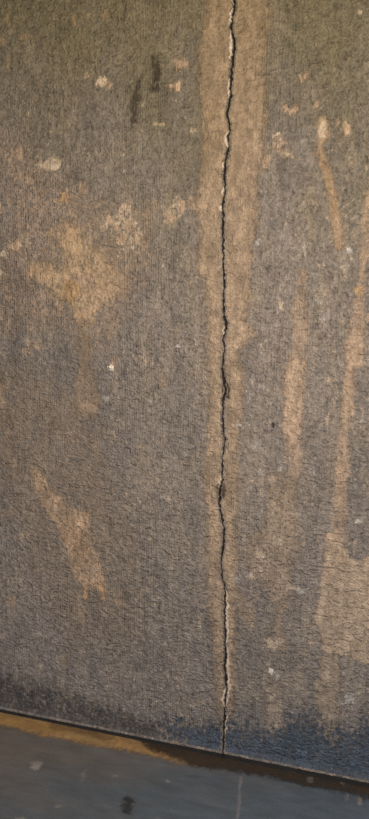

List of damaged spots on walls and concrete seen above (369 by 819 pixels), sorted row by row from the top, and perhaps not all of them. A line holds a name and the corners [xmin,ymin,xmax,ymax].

peeling [0,131,153,343]
peeling [164,196,194,224]
crack [217,0,236,760]
peeling [0,373,136,640]
peeling [314,532,369,664]